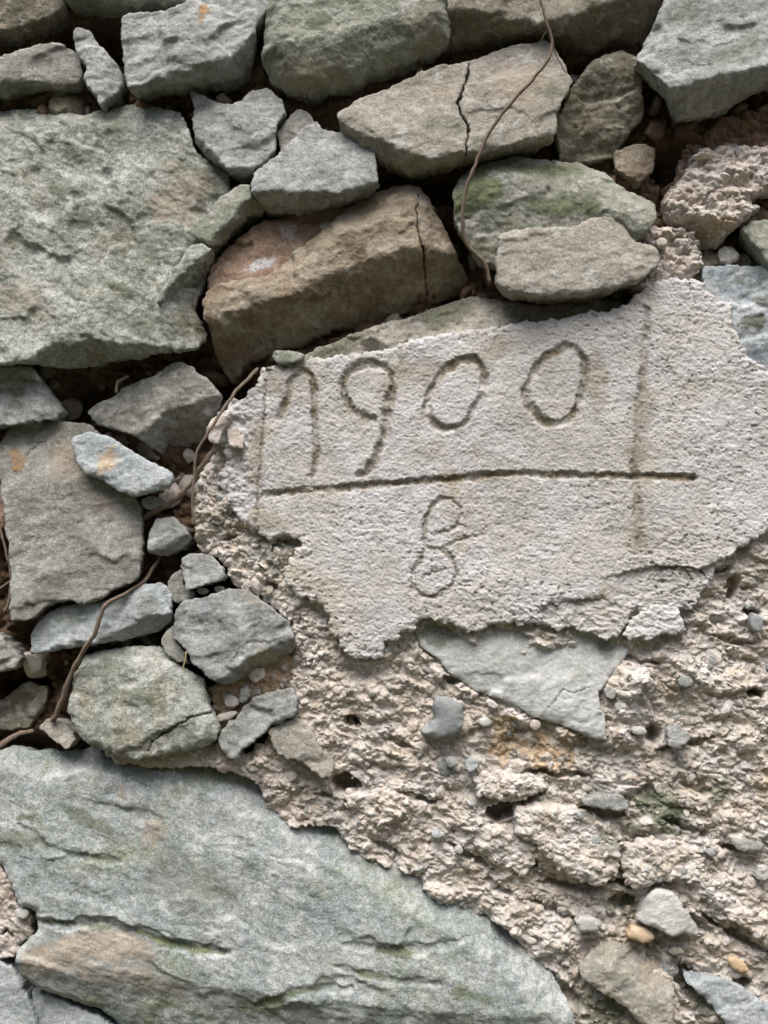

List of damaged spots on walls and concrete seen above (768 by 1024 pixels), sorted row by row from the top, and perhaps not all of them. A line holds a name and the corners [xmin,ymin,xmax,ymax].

crack [457,69,469,156]
spalling [191,447,768,1024]